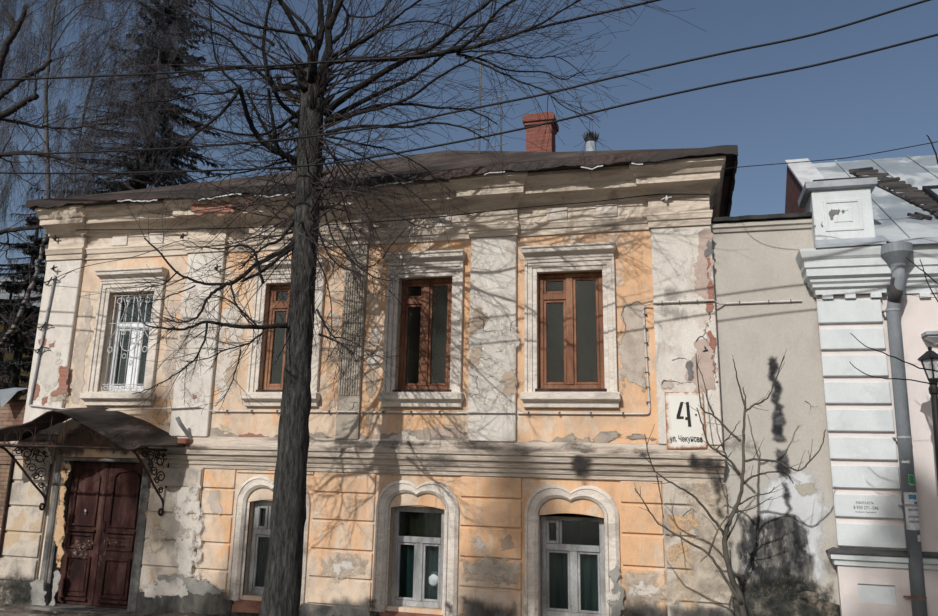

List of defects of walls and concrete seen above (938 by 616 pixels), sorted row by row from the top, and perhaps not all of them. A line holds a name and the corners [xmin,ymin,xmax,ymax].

flaking render [31,292,93,405]
flaking render [468,307,520,414]
flaking render [660,228,718,392]
flaking render [209,425,278,438]
flaking render [359,427,468,441]
flaking render [528,431,658,443]
leakage [735,358,832,603]
peeling [140,481,223,599]
peeling [319,553,368,582]
peeling [464,534,520,584]
peeling [605,483,732,608]